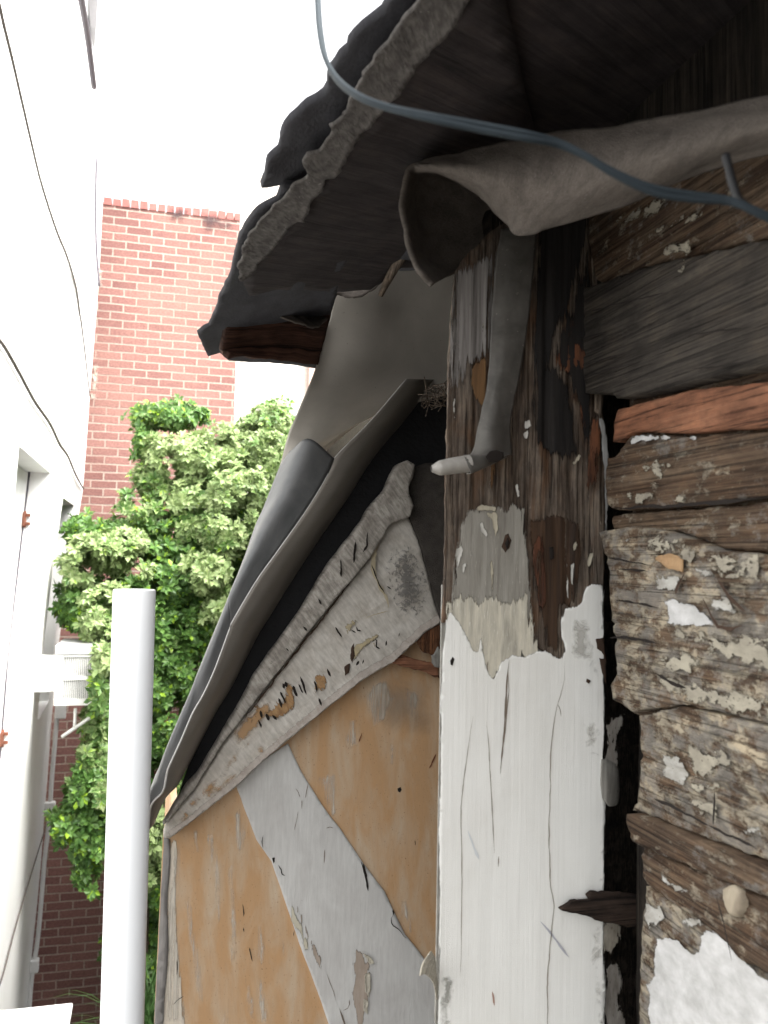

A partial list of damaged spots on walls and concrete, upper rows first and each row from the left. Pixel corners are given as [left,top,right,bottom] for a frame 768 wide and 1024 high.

peeling [448,254,497,418]
peeling [627,459,671,504]
peeling [631,434,670,444]
peeling [344,620,379,676]
peeling [451,484,593,652]
peeling [596,638,606,683]
peeling [648,534,768,720]
crack [460,664,509,972]
crack [547,669,565,1024]
peeling [644,744,734,823]
peeling [353,950,374,1024]
peeling [644,904,768,1024]